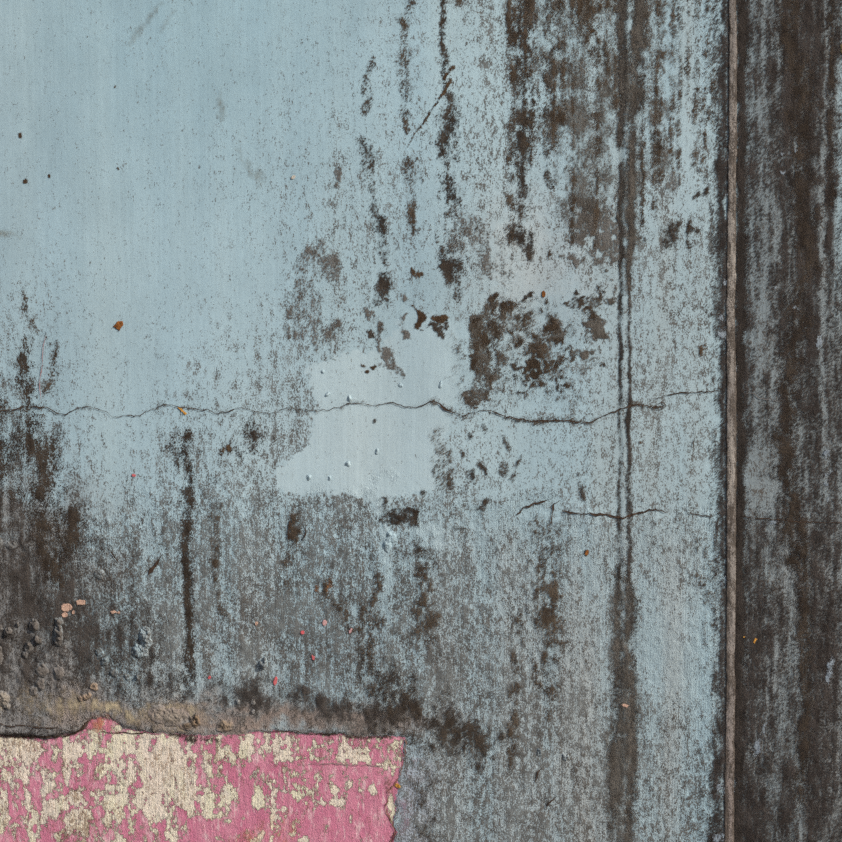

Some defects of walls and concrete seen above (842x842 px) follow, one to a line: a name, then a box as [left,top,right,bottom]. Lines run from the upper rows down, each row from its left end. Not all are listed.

water stain [207,411,277,487]
crack [0,333,719,427]
water stain [356,0,842,842]
water stain [0,291,203,737]
water stain [208,502,228,622]
water stain [281,512,302,589]
crack [517,499,667,522]
crack [743,516,842,524]
water stain [320,573,386,668]
peeling [0,718,405,842]